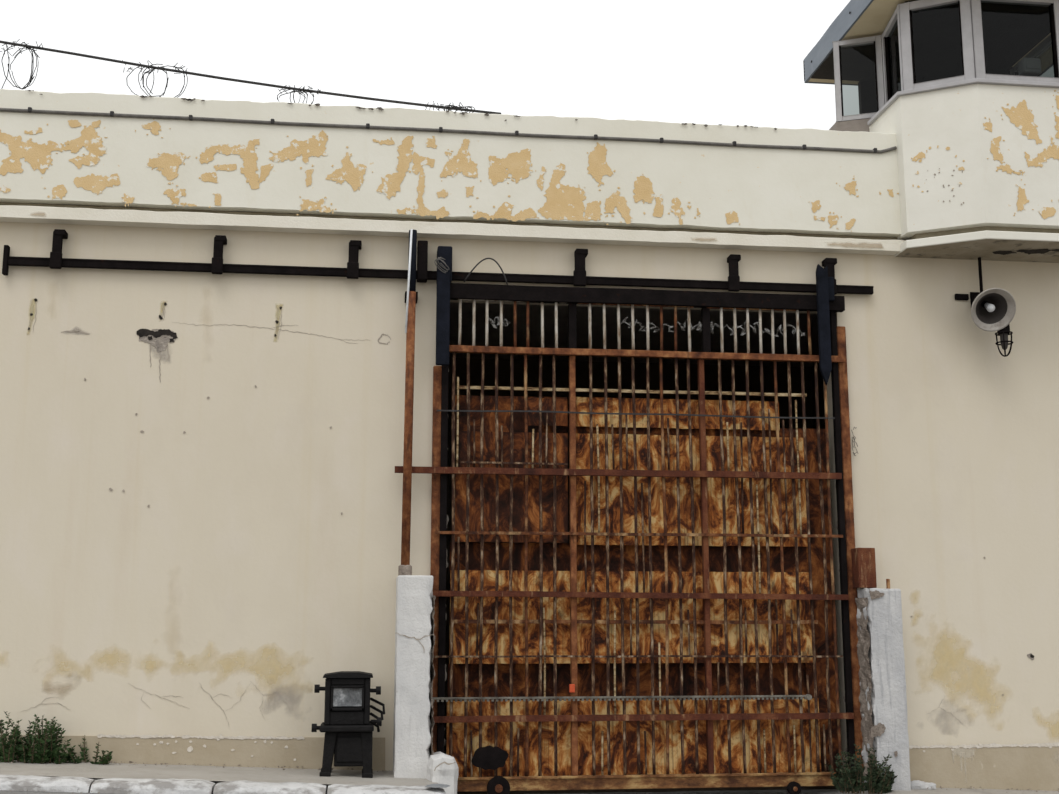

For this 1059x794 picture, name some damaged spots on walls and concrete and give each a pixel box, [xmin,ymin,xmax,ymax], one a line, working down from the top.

peeling [0,120,135,207]
peeling [135,121,171,138]
peeling [147,130,701,225]
peeling [725,211,740,225]
peeling [809,200,856,232]
peeling [836,178,859,197]
peeling [911,145,965,205]
peeling [983,90,1059,219]
flaking render [136,329,178,382]
crack [128,681,294,740]